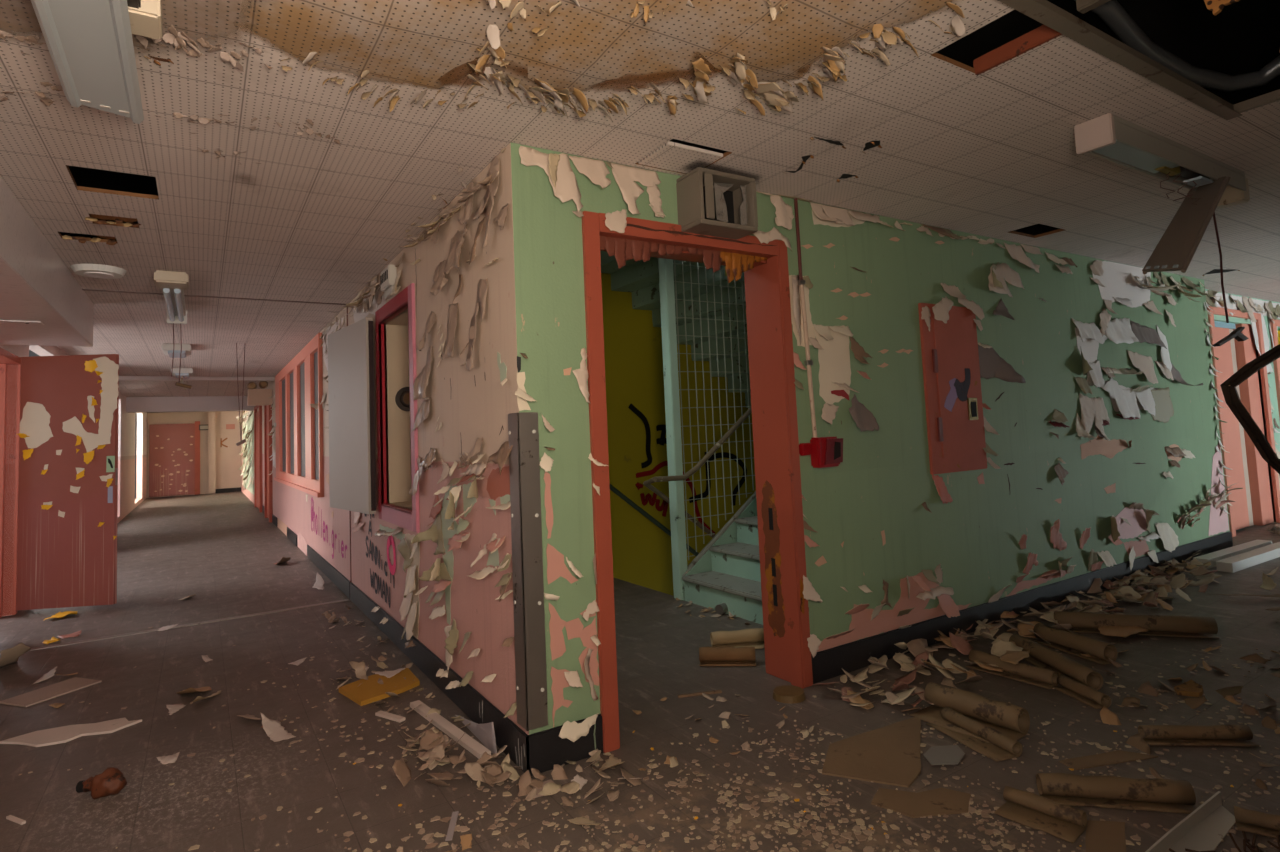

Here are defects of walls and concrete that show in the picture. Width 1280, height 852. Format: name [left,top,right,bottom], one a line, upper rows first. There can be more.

leakage [0,0,42,34]
peeling [135,25,324,72]
leakage [132,0,953,94]
peeling [928,2,965,37]
peeling [62,217,141,245]
peeling [310,146,665,432]
peeling [17,357,119,493]
peeling [752,191,1280,711]
peeling [41,501,65,518]
peeling [497,352,601,742]